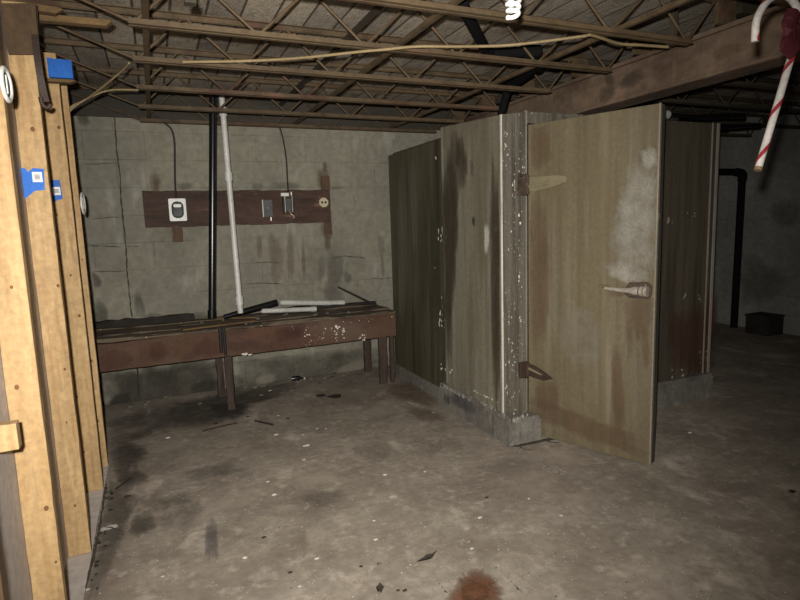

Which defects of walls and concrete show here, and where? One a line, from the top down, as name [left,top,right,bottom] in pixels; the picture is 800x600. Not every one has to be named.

leakage [443,146,464,313]
leakage [491,177,499,370]
rust [451,573,499,600]